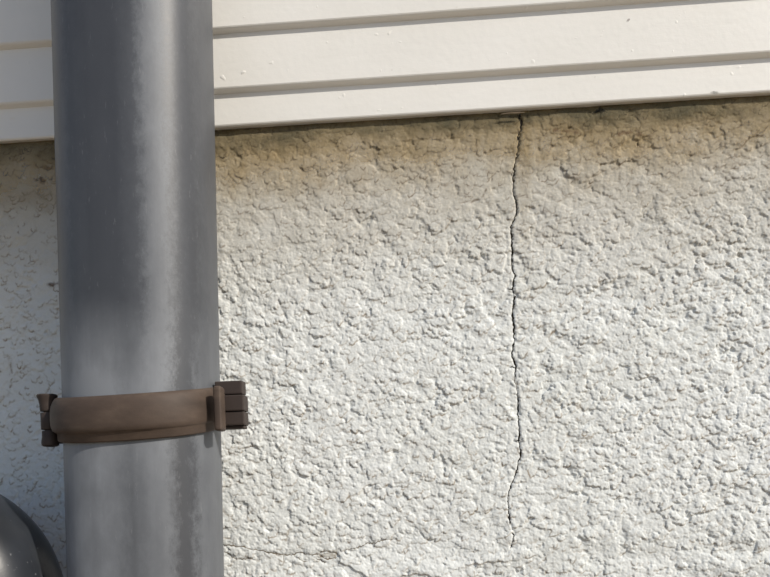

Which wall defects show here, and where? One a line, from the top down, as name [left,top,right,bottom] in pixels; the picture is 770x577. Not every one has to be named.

damp [215,95,770,191]
crack [507,113,523,550]